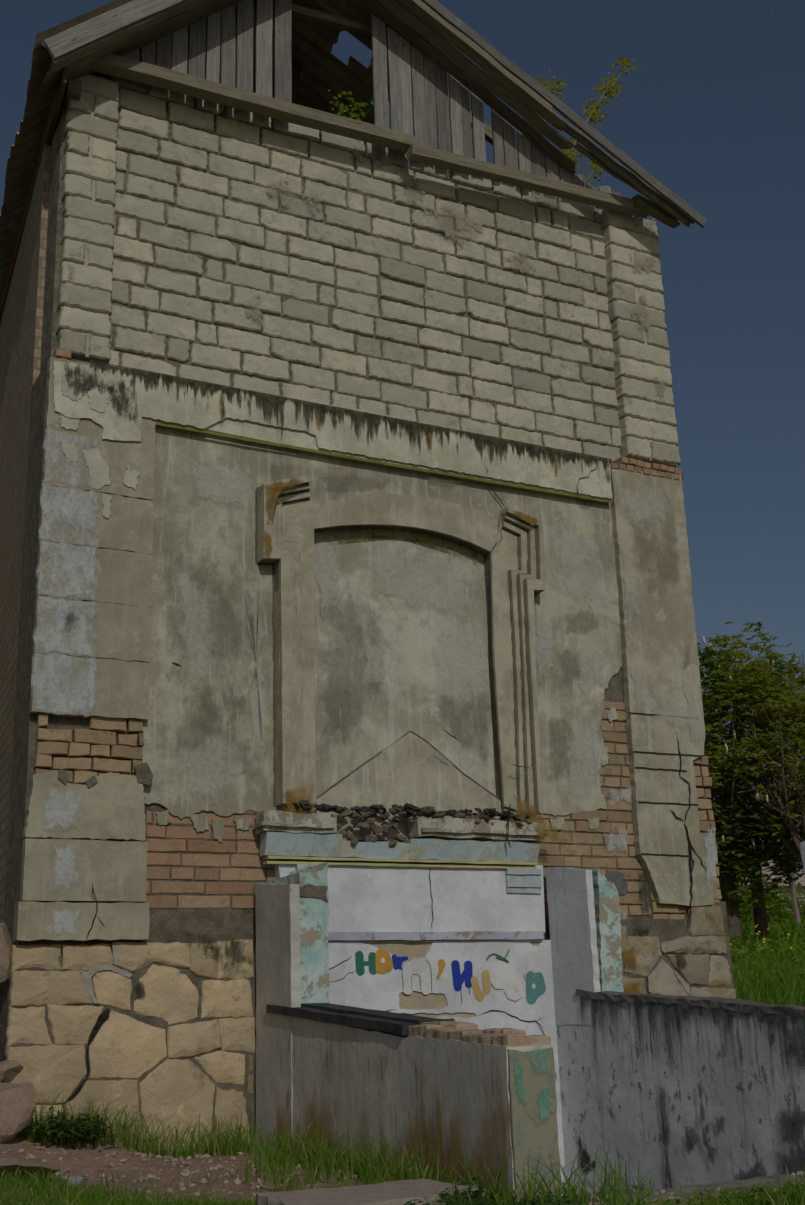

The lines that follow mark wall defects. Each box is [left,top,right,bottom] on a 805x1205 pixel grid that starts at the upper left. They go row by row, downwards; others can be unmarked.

damp [184,386,252,419]
peeling [31,373,139,715]
peeling [53,845,78,887]
peeling [45,768,98,830]
spalling [134,763,154,786]
crack [670,731,707,928]
crack [86,883,104,940]
crack [65,1008,109,1102]
damp [580,994,805,1080]
damp [579,1134,596,1173]
damp [660,1088,672,1188]
damp [737,1105,805,1180]